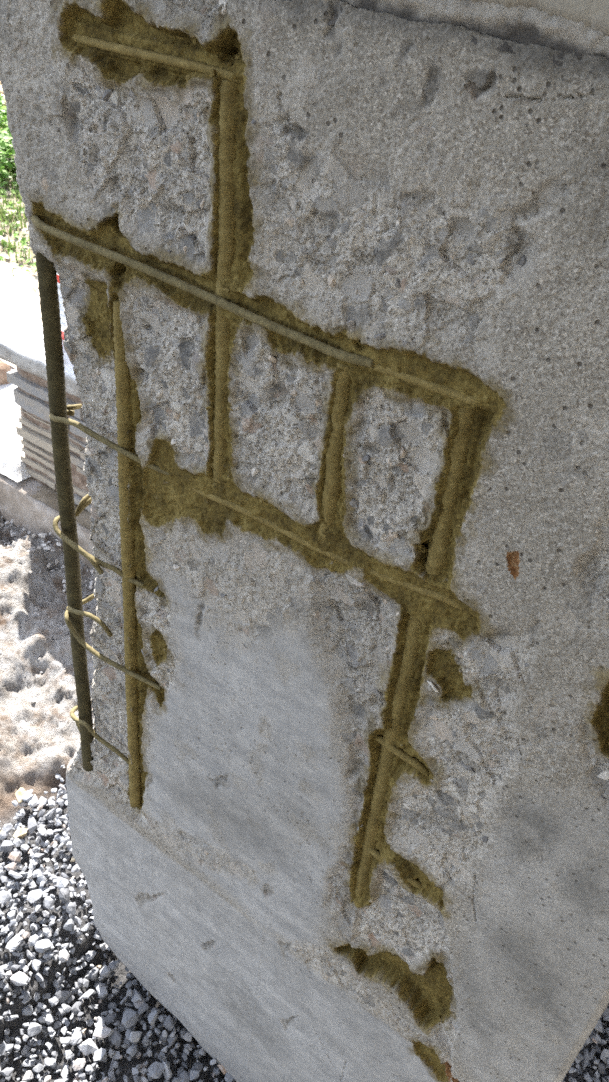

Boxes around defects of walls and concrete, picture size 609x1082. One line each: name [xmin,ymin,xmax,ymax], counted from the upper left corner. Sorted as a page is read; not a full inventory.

spalling [0,0,233,270]
spalling [248,76,551,374]
spalling [420,57,446,112]
spalling [463,68,502,103]
spalling [54,262,210,833]
spalling [228,327,335,514]
spalling [343,388,452,568]
rust [506,551,520,580]
spalling [140,524,542,1082]
spalling [581,685,609,809]
spalling [134,891,168,909]